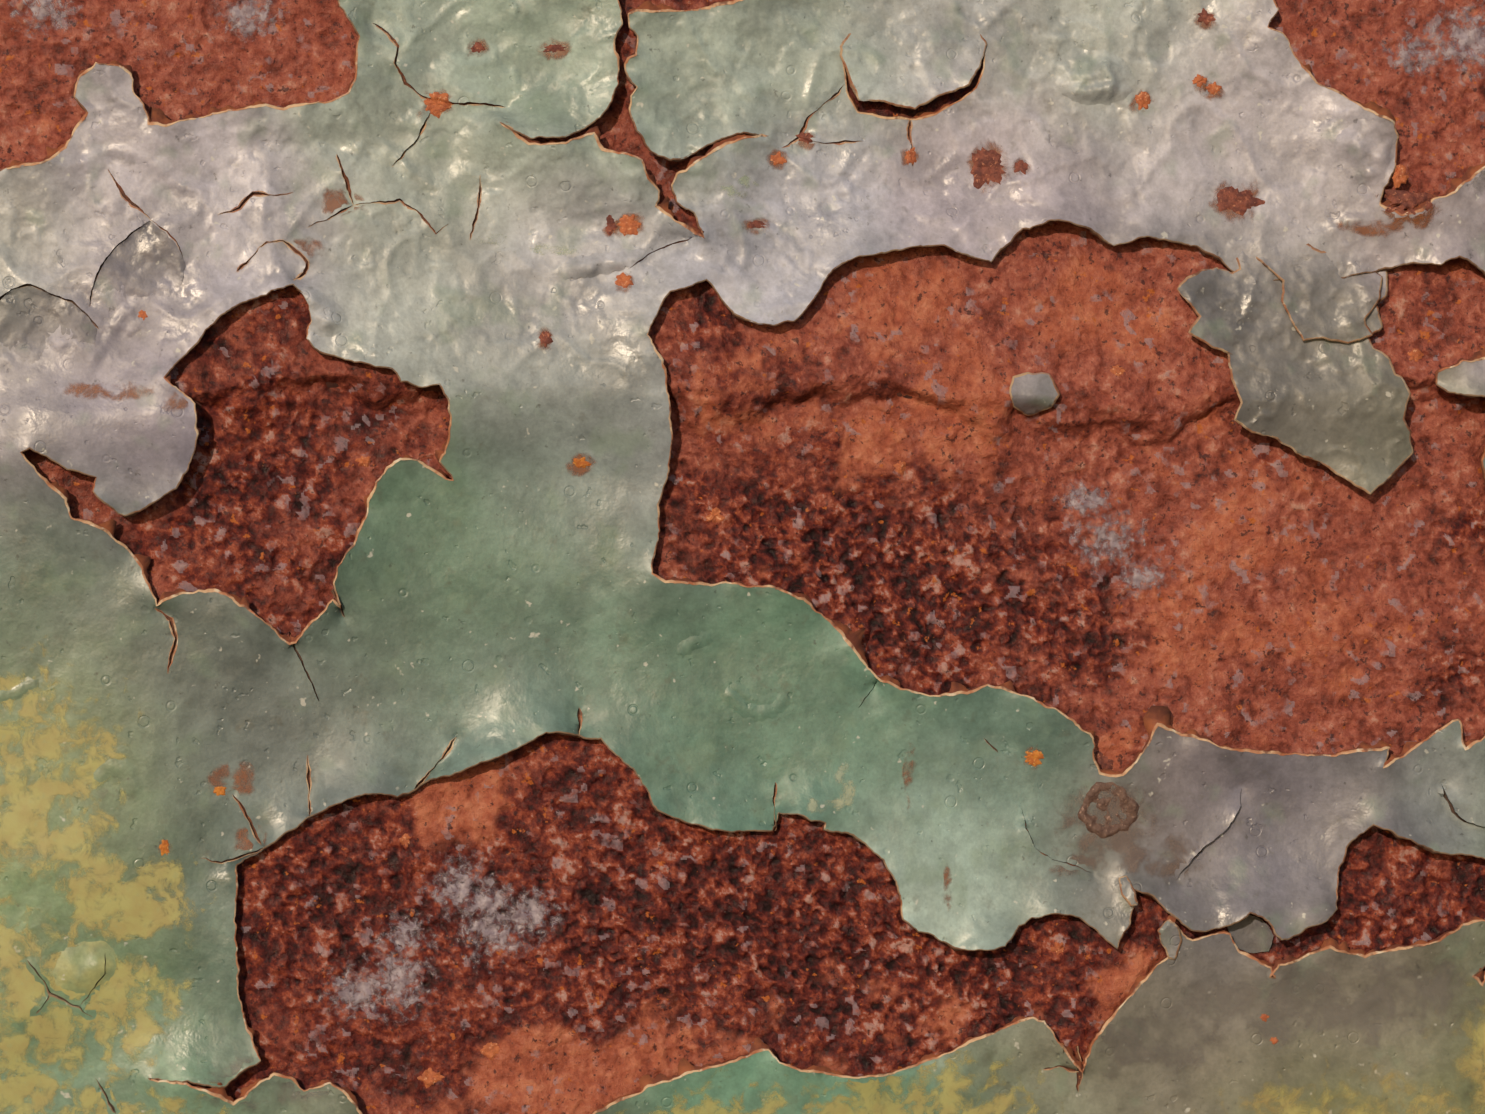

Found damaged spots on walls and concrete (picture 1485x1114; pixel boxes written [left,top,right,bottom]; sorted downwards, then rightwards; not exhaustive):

crack [236,24,504,280]
crack [220,191,291,214]
corrosion [324,190,360,213]
corrosion [615,272,634,288]
corrosion [539,330,553,348]
corrosion [568,454,591,475]
corrosion [647,219,1485,777]
spalling [1078,782,1139,839]
corrosion [148,731,1485,1114]